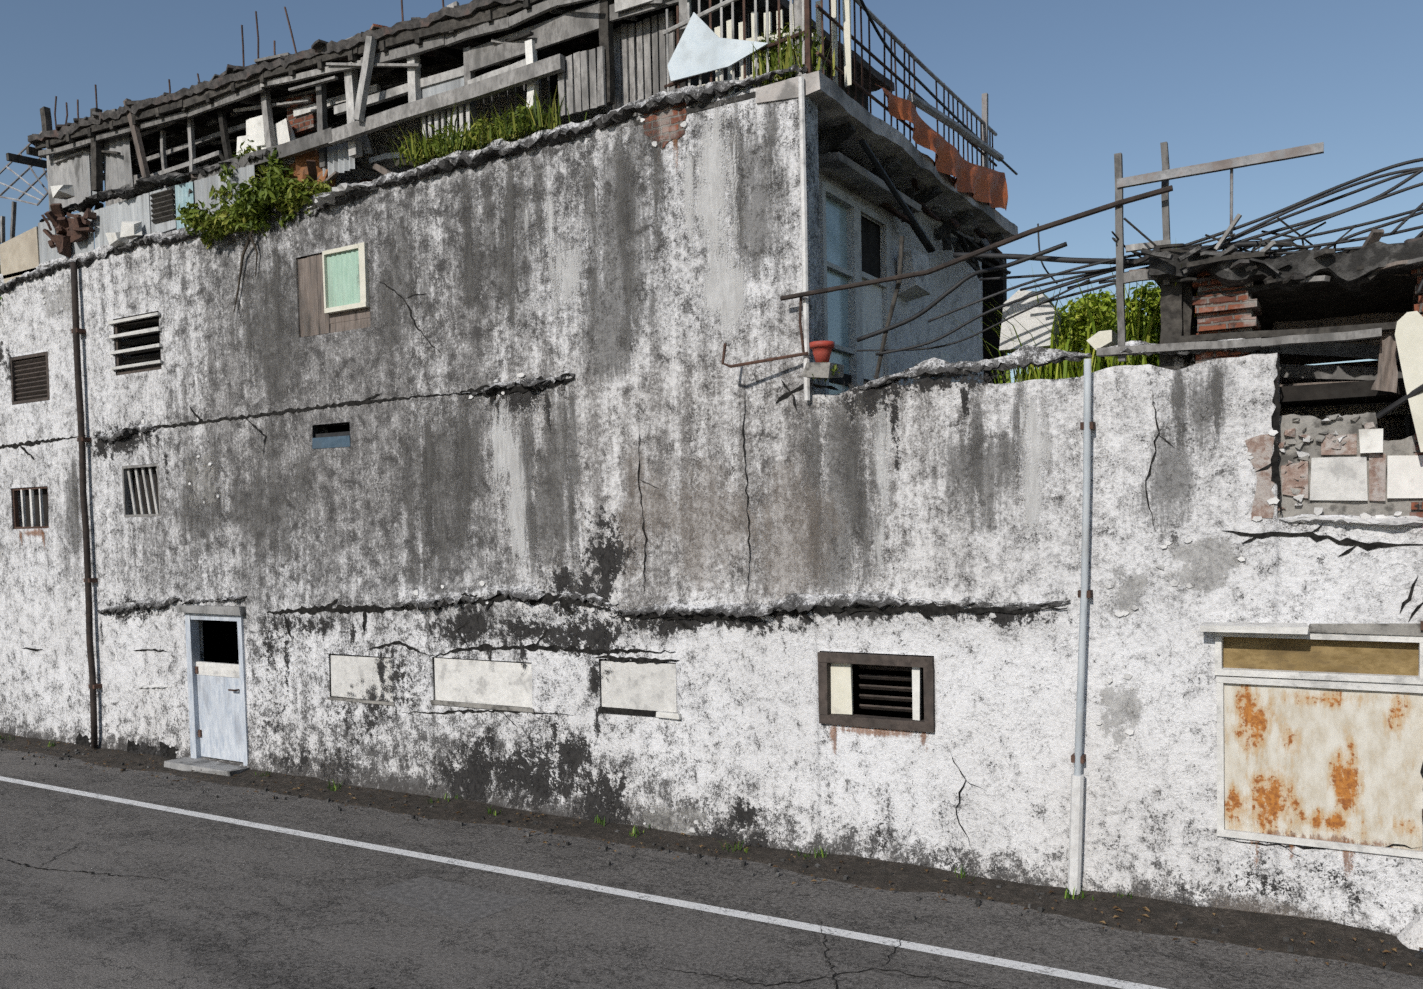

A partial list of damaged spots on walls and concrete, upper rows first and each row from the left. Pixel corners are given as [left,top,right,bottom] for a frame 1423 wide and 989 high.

leakage [546,191,582,316]
leakage [682,104,751,345]
leakage [480,373,570,564]
leakage [827,360,1018,579]
crack [1145,392,1172,529]
peeling [1245,430,1280,522]
crack [1222,356,1423,622]
leakage [252,611,423,785]
crack [267,599,675,657]
leakage [419,505,1078,827]
crack [951,755,983,845]